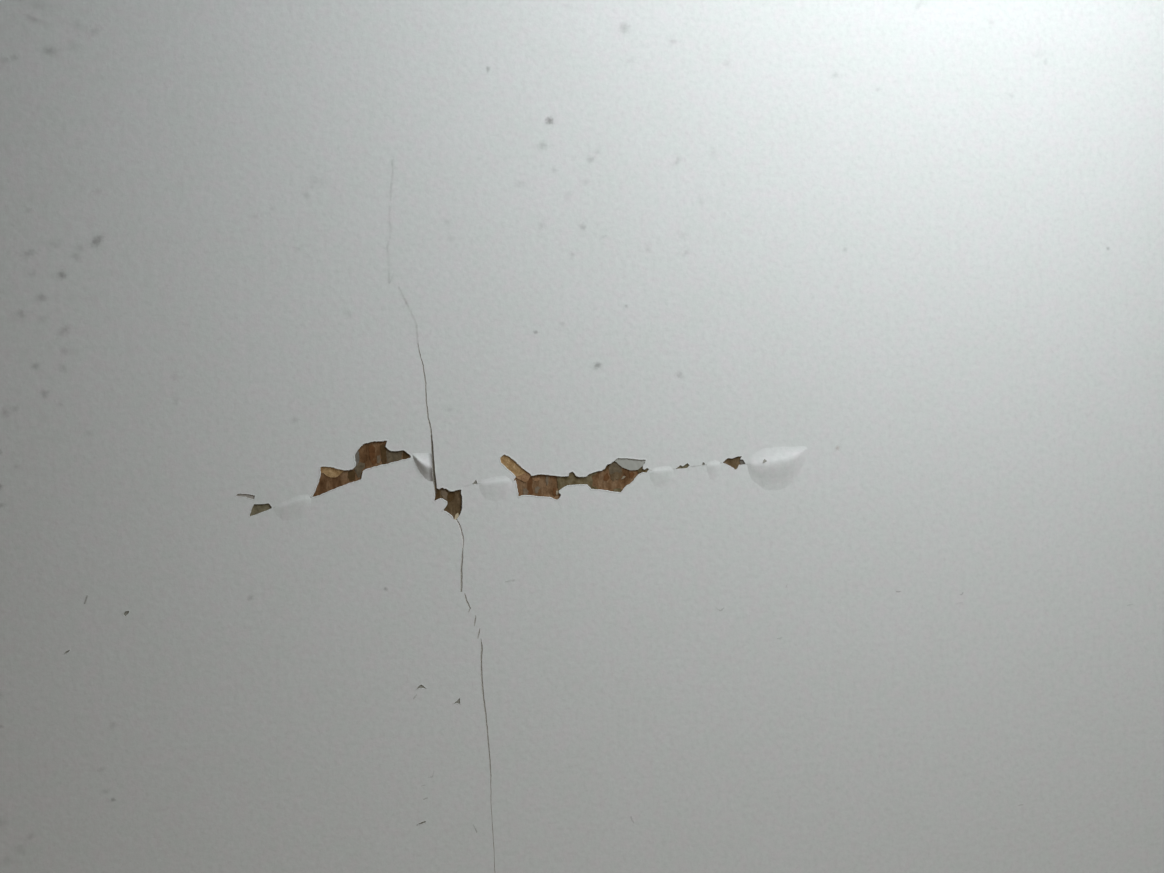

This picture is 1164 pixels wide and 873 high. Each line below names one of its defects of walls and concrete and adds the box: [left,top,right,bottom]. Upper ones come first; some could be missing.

peeling [235,493,273,517]
crack [418,345,437,493]
peeling [722,455,747,471]
crack [455,519,495,873]